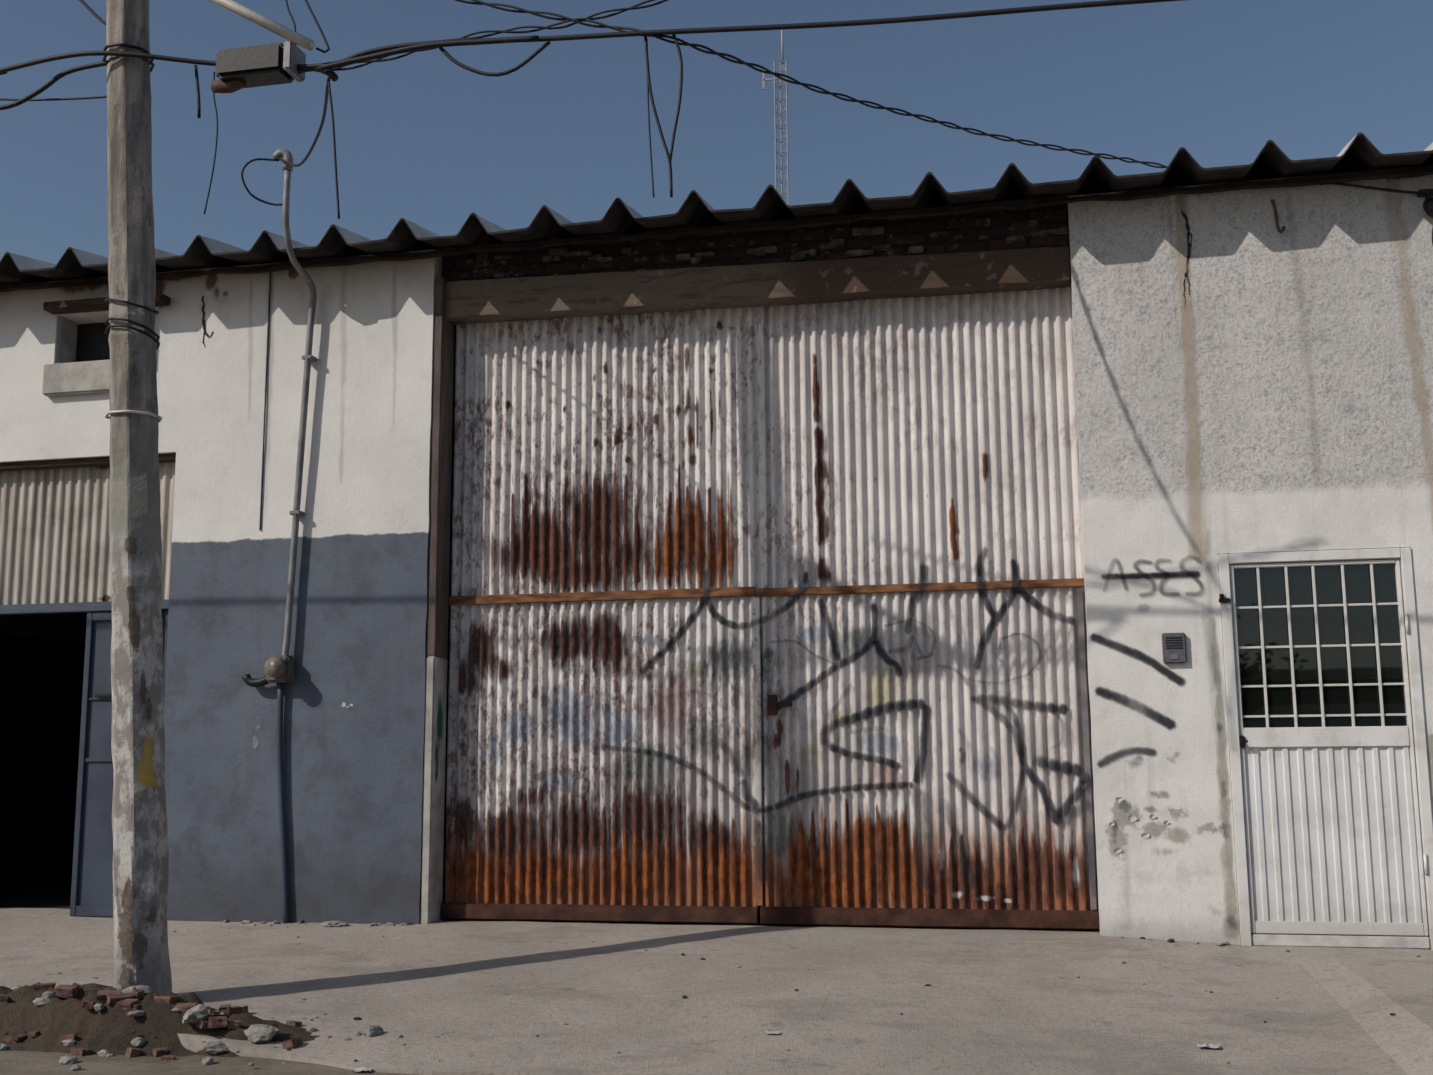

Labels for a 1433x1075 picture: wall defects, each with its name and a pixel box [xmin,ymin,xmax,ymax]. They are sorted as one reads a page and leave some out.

crack [1177,194,1192,306]
rust [482,390,734,599]
rust [812,355,831,581]
rust [949,499,959,560]
rust [458,622,513,696]
rust [541,611,626,670]
rust [444,778,755,907]
rust [777,798,1084,910]
peeling [1106,797,1186,855]